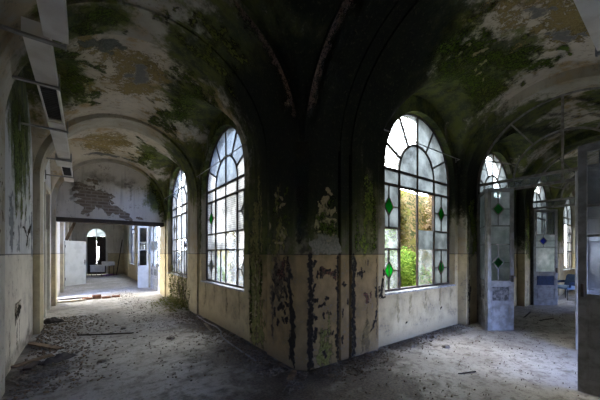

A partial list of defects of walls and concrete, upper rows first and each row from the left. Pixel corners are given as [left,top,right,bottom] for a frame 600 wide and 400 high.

leakage [78,38,127,55]
peeling [72,35,176,115]
peeling [79,132,143,161]
flaking render [72,178,143,221]
peeling [314,187,337,240]
flaking render [249,252,296,369]
peeling [306,250,369,371]